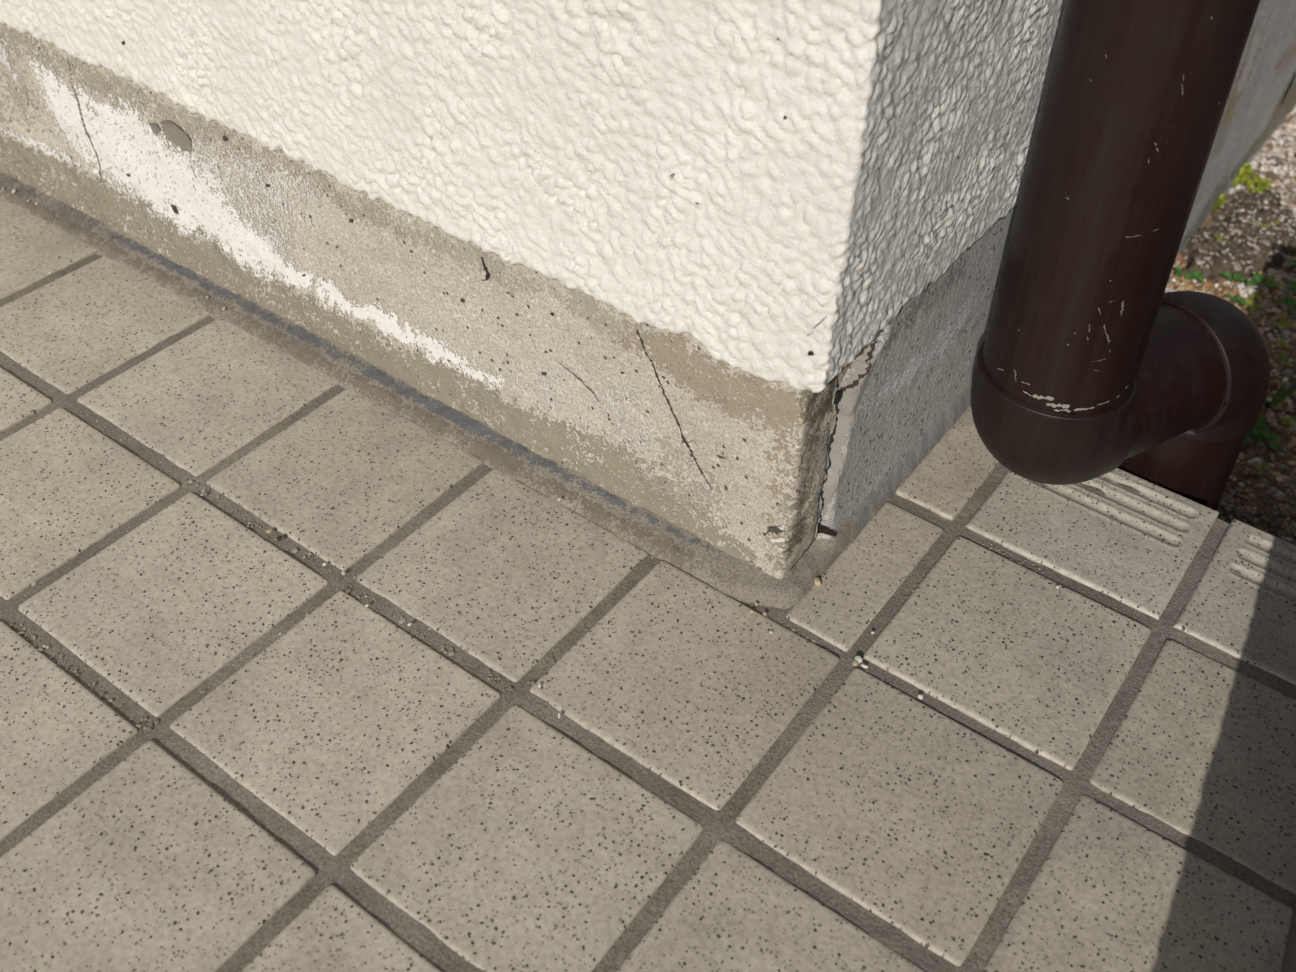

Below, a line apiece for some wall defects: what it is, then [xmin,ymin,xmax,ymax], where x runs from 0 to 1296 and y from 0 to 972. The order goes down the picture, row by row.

water stain [0,23,837,599]
crack [636,330,712,490]
crack [790,341,877,570]